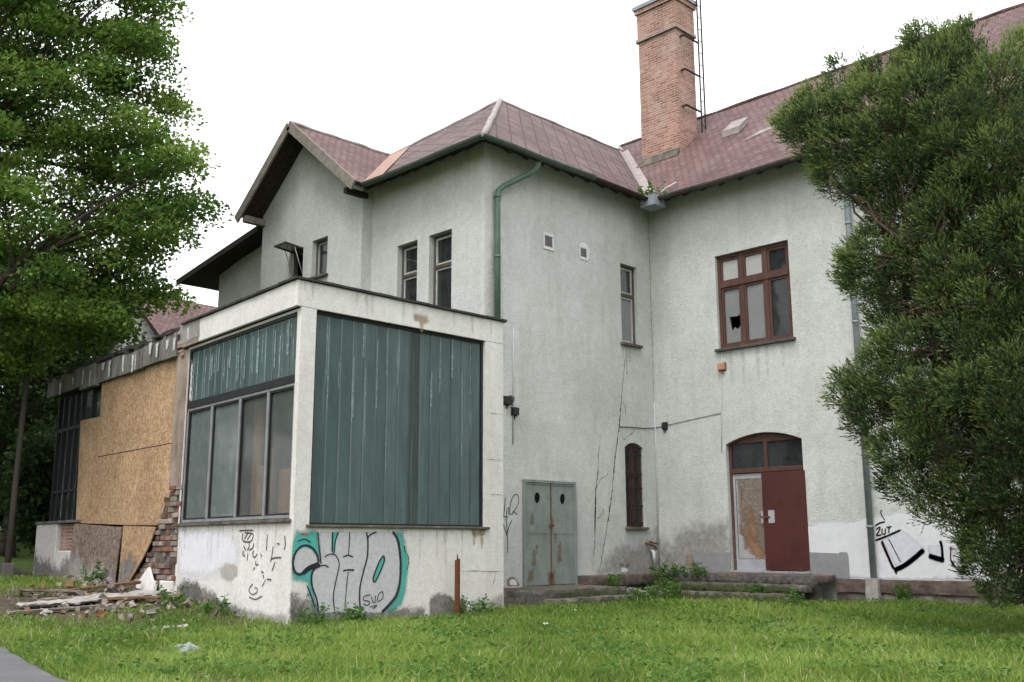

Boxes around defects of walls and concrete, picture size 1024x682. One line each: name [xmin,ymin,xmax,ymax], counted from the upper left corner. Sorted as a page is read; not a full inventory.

crack [593,359,635,572]
rust [737,479,765,559]